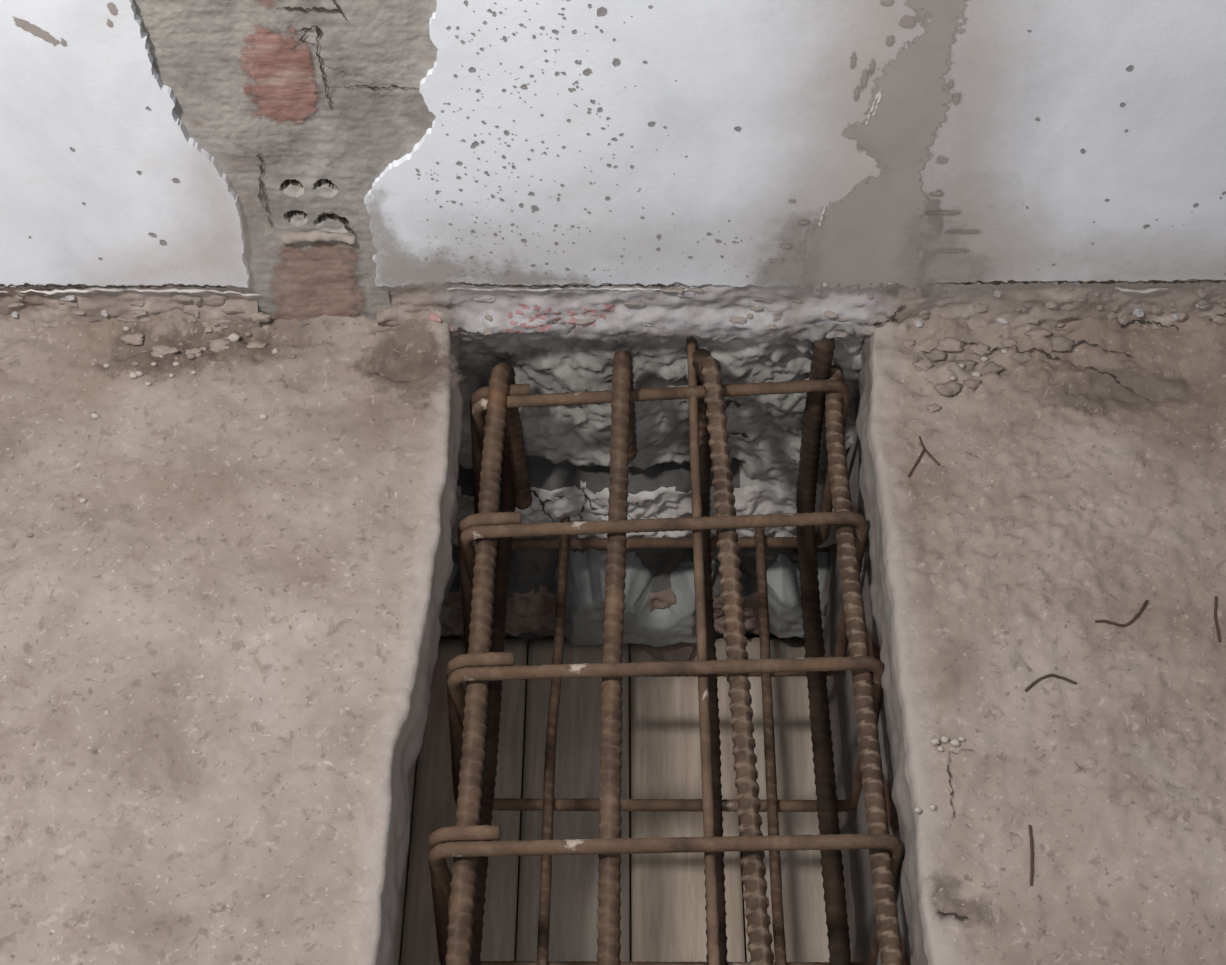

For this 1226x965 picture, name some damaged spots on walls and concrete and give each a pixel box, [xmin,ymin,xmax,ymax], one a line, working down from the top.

spalling [446,0,634,169]
spalling [415,120,565,208]
spalling [511,176,591,253]
crack [918,280,1226,402]
corrosion [867,629,882,660]
corrosion [884,780,899,831]